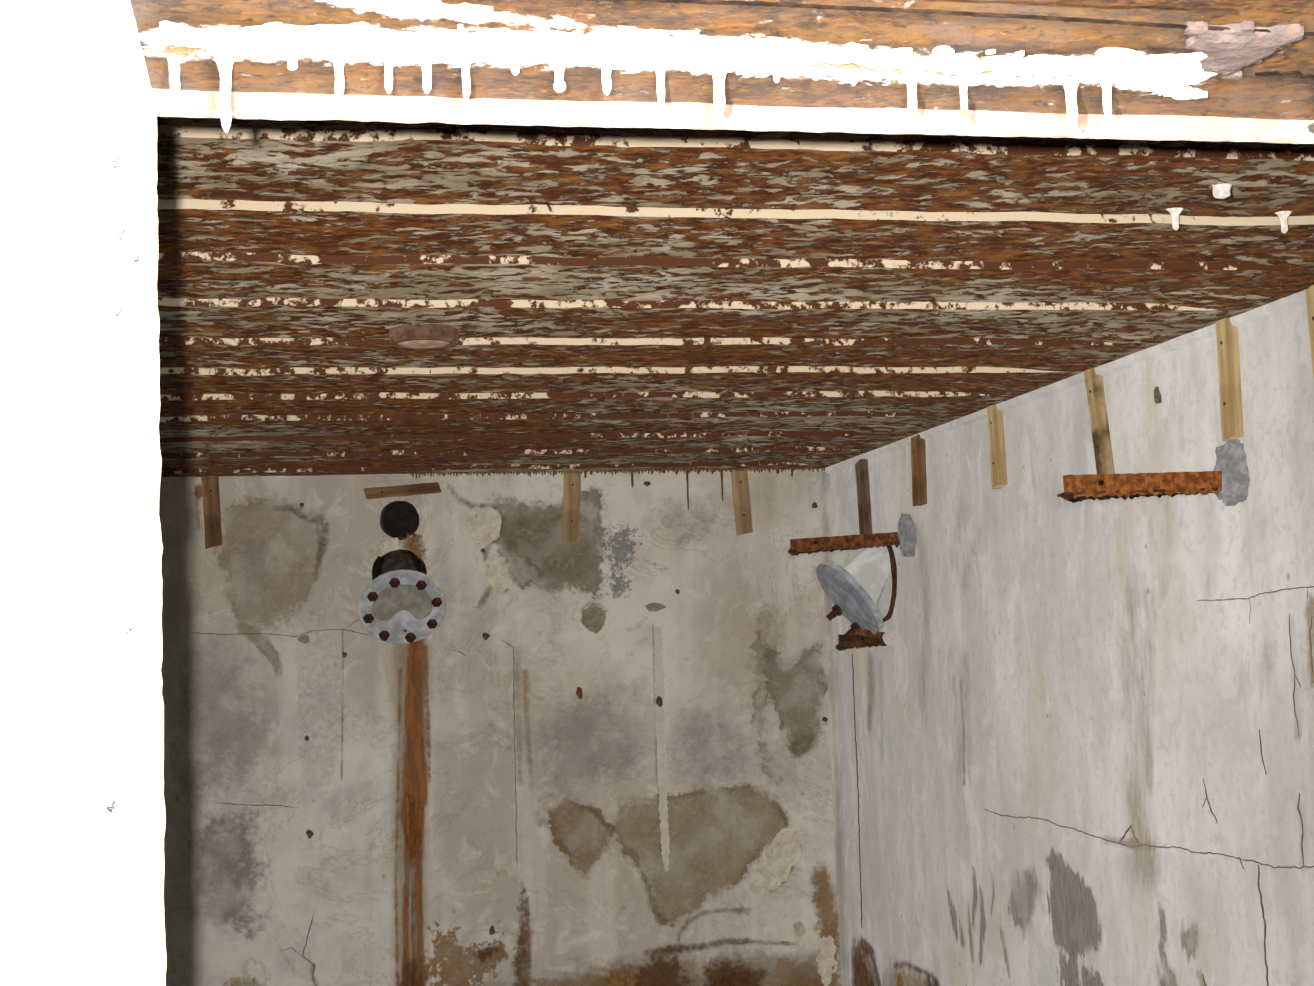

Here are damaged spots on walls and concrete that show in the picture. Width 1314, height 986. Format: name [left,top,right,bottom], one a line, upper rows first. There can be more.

leakage [137,0,1218,100]
peeling [1184,21,1304,80]
crack [1197,586,1314,735]
corrosion [395,640,822,986]
crack [1202,779,1217,822]
crack [1258,729,1266,774]
crack [984,793,1314,986]
corrosion [852,940,939,986]